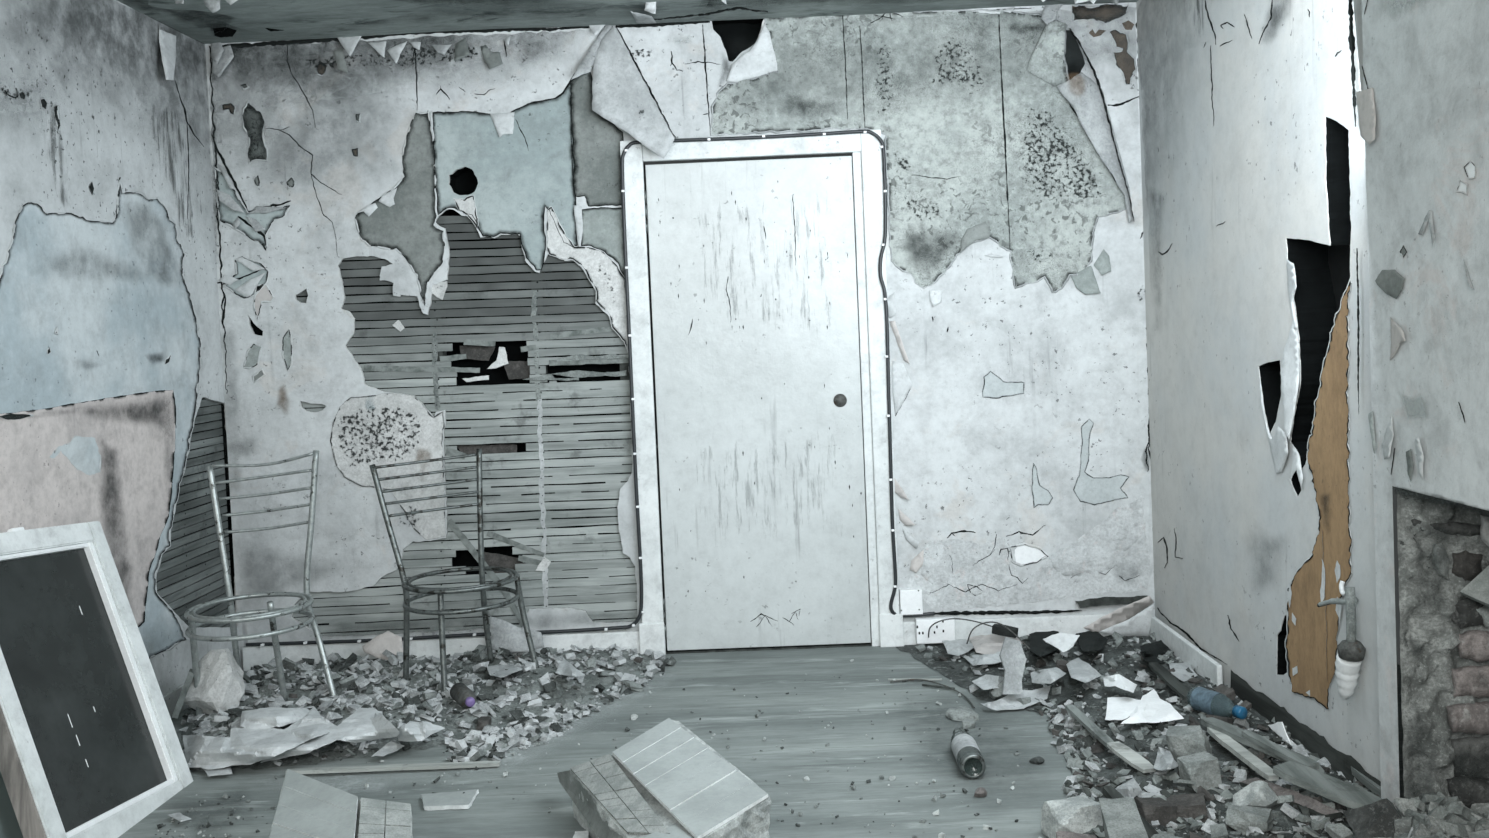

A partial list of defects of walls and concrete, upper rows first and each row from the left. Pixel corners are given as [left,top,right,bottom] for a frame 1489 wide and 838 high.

peeling [631,2,656,24]
flaking render [712,0,763,62]
peeling [976,6,1016,14]
peeling [1041,0,1137,85]
water stain [1023,102,1101,204]
flaking render [960,222,1003,257]
peeling [1071,249,1111,294]
flaking render [291,72,637,637]
peeling [982,371,1024,399]
peeling [0,180,238,659]
water stain [338,407,420,467]
flaking render [907,419,1150,610]